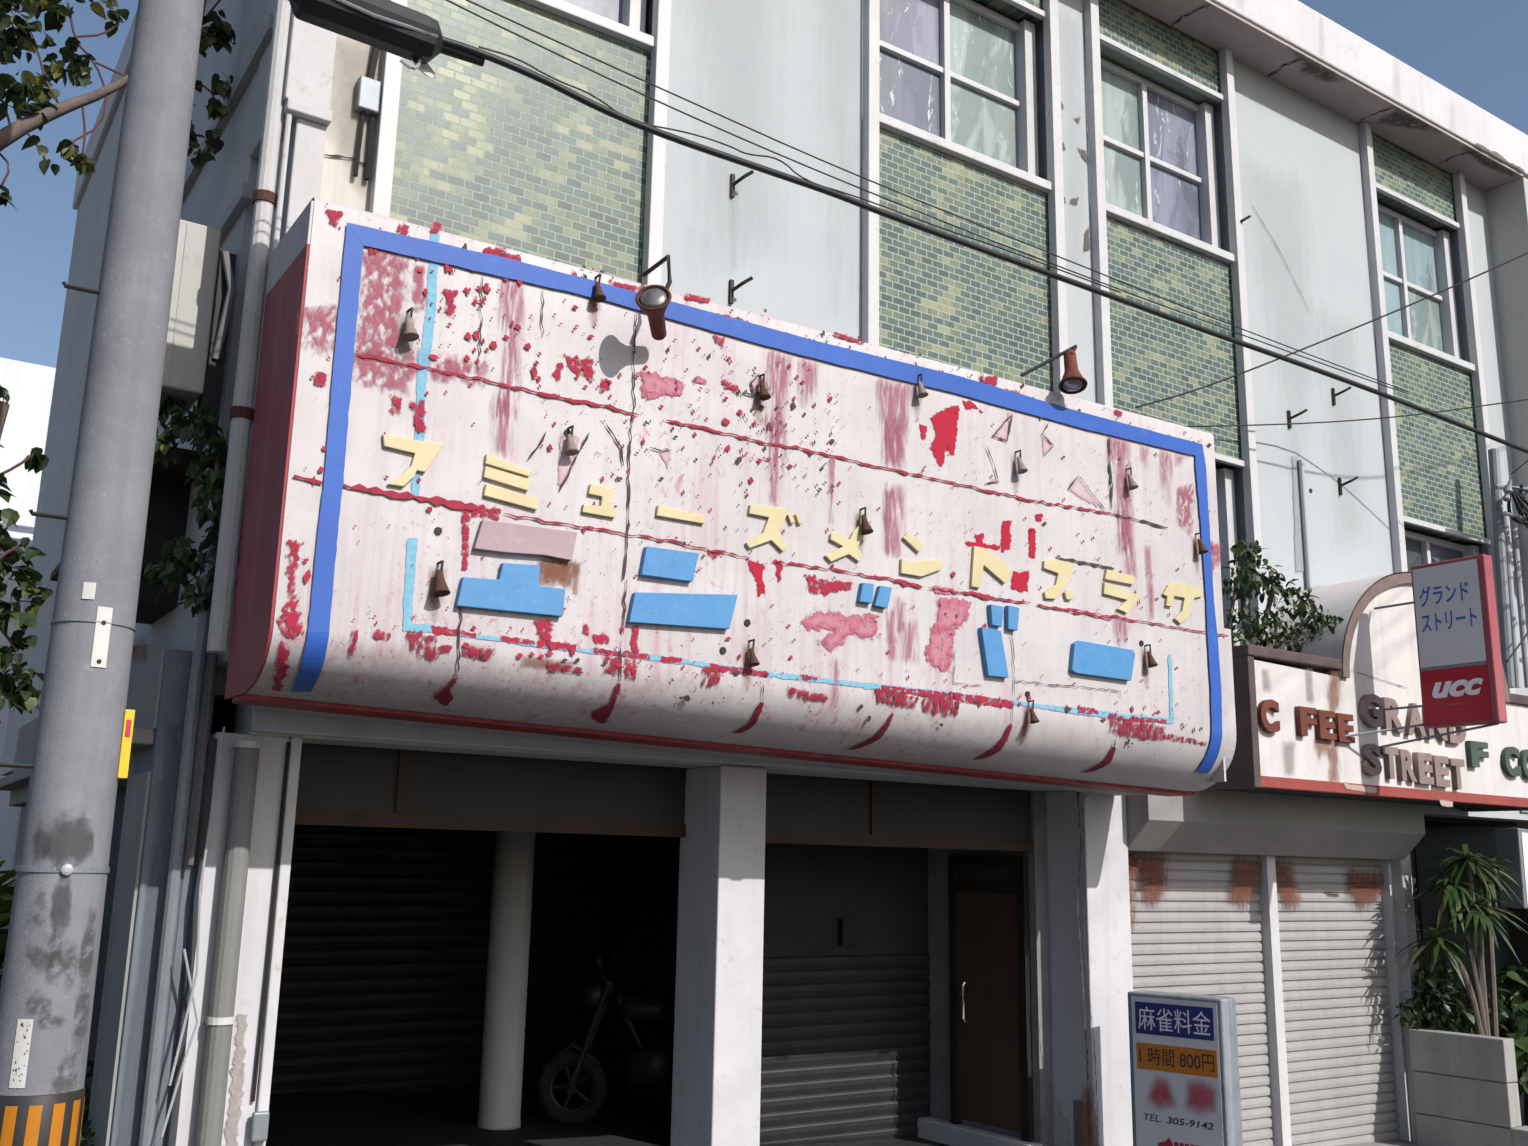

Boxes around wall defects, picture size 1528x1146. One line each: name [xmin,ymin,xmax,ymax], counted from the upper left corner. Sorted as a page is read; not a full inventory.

peeling [326,203,347,229]
peeling [463,239,522,262]
peeling [390,383,475,433]
peeling [407,258,871,578]
peeling [913,400,1127,651]
peeling [343,550,1045,728]
peeling [1055,679,1206,753]
leakage [33,818,94,932]
corrosion [1128,851,1168,929]
corrosion [1230,856,1301,908]
corrosion [1349,868,1384,908]
leakage [30,930,95,972]